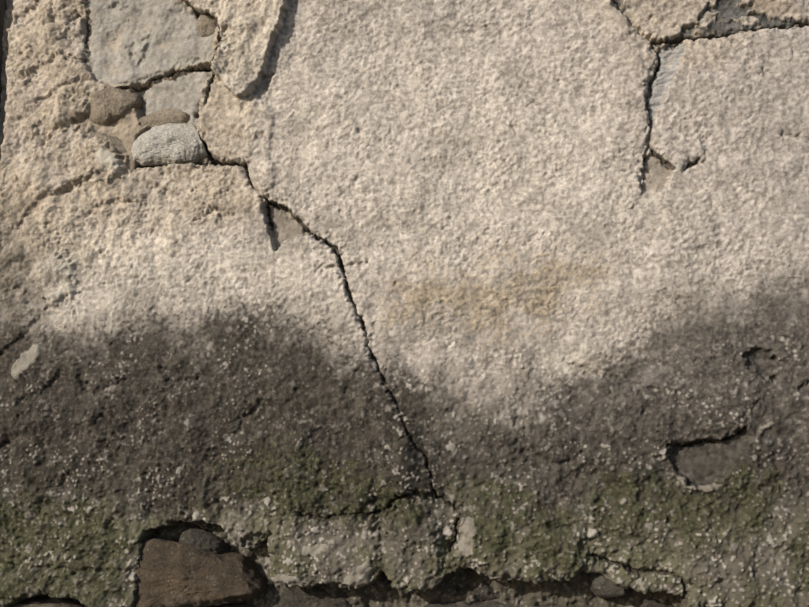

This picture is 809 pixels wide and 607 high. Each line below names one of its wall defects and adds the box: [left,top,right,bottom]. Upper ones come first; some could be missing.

flaking render [73,0,247,173]
crack [120,0,222,98]
crack [613,0,809,188]
flaking render [647,0,808,127]
crack [196,141,384,378]
crack [305,494,412,521]
damp [0,277,809,536]
crack [403,418,460,554]
flaking render [667,439,732,494]